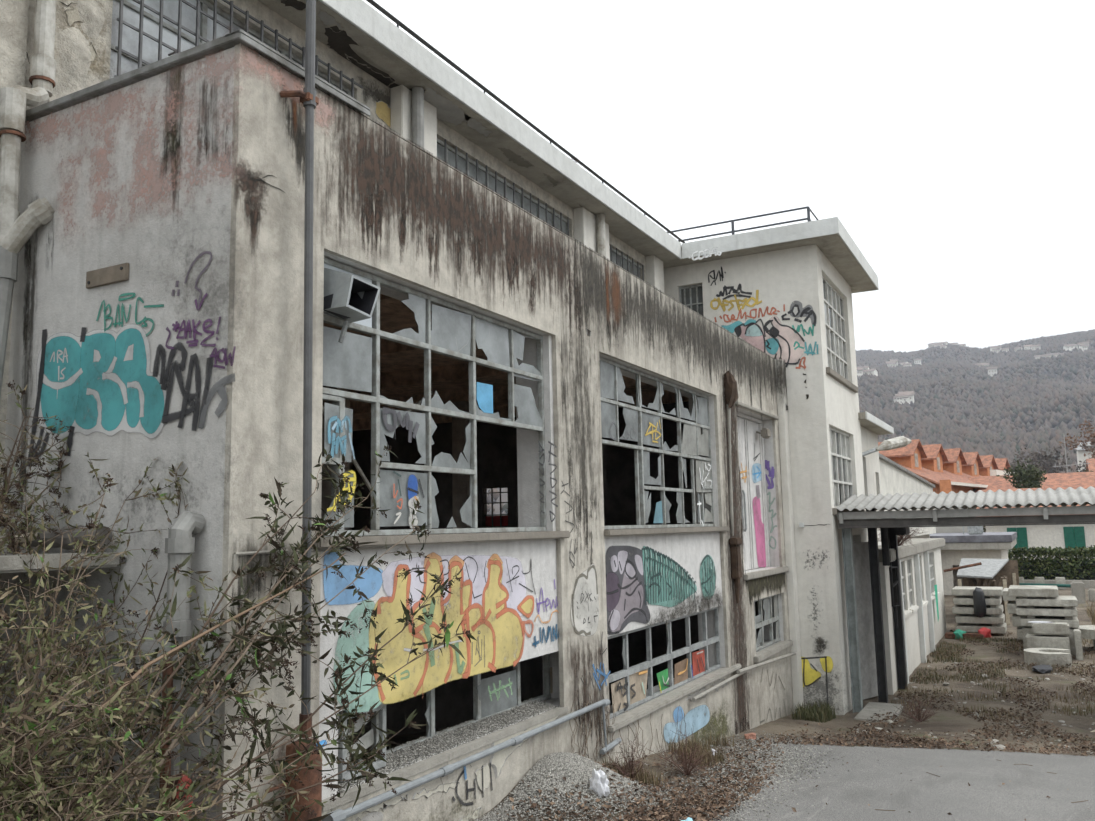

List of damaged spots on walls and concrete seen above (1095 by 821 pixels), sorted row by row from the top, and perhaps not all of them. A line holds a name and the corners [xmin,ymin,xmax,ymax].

leakage [160,64,184,203]
leakage [199,82,217,151]
leakage [284,90,305,166]
leakage [360,78,390,106]
leakage [234,163,265,244]
leakage [326,92,787,745]